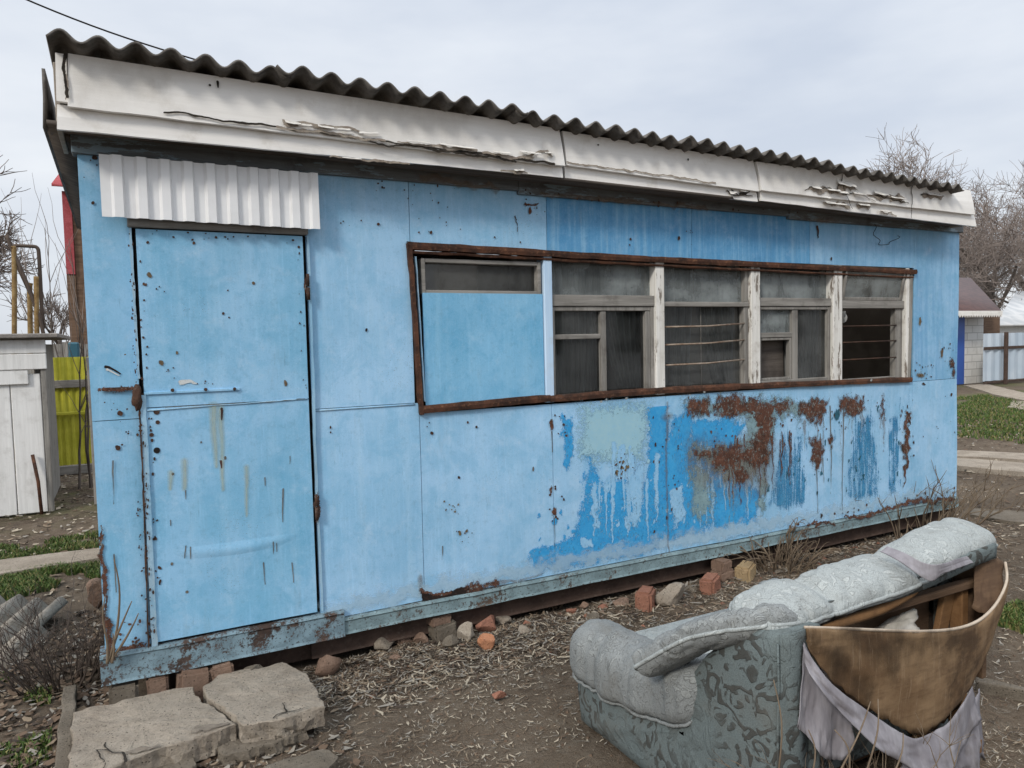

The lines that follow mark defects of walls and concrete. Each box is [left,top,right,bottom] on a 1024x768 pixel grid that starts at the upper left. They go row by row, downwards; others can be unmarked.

peeling [163,111,555,174]
peeling [808,179,905,217]
corrosion [94,260,213,657]
corrosion [165,403,236,489]
peeling [527,391,901,574]
corrosion [684,392,955,528]
corrosion [465,577,499,593]